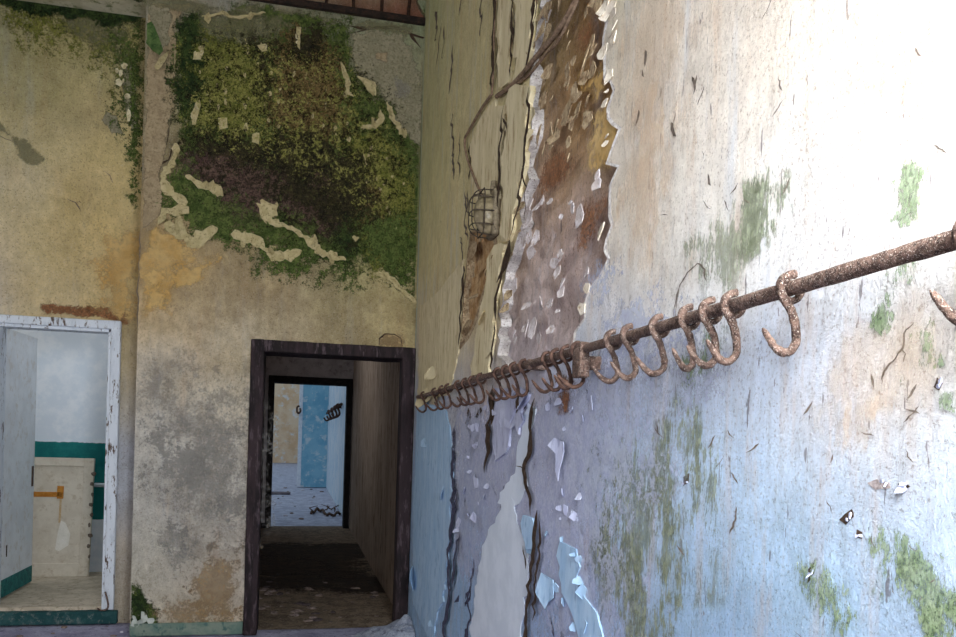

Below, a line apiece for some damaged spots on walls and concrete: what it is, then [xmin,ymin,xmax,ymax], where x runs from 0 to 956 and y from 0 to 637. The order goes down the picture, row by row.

spalling [310,0,425,18]
damp [0,124,44,165]
damp [156,1,419,297]
spalling [376,0,622,637]
corrosion [557,375,574,415]
damp [594,454,680,637]
damp [826,593,857,637]
damp [916,597,956,637]